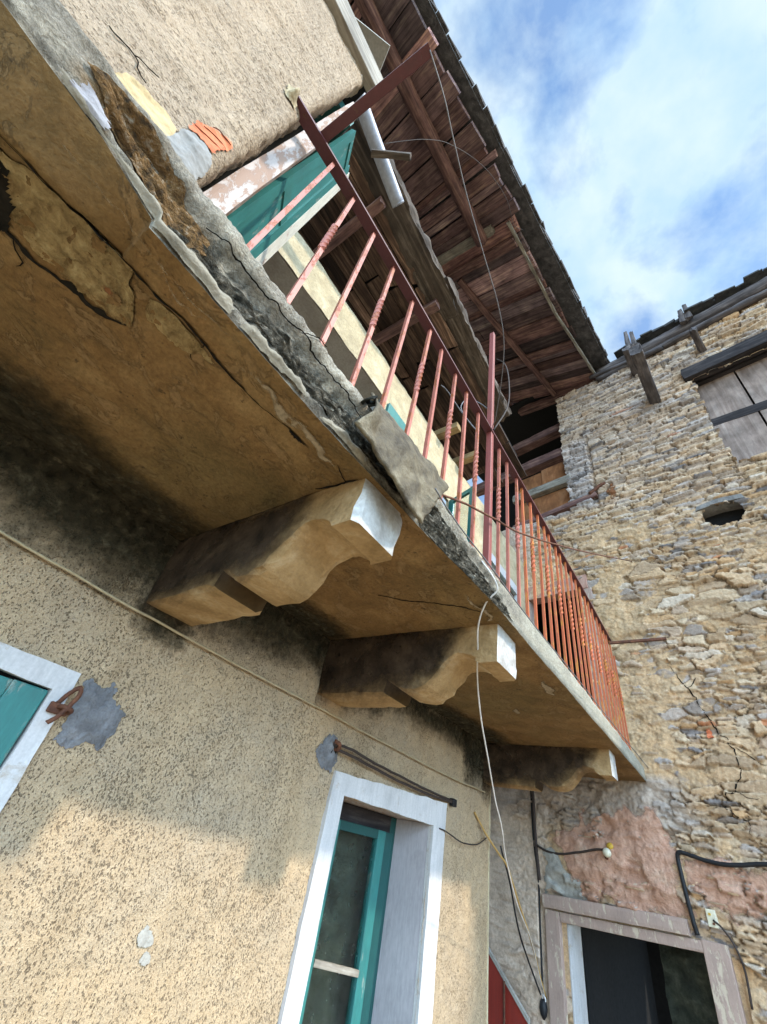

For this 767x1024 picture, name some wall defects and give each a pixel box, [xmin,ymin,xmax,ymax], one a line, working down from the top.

crack [109,26,159,83]
spalling [0,149,214,364]
crack [0,136,290,428]
spalling [60,61,407,508]
crack [206,227,361,418]
leakage [0,365,596,794]
crack [667,665,763,848]
peeling [552,806,767,925]